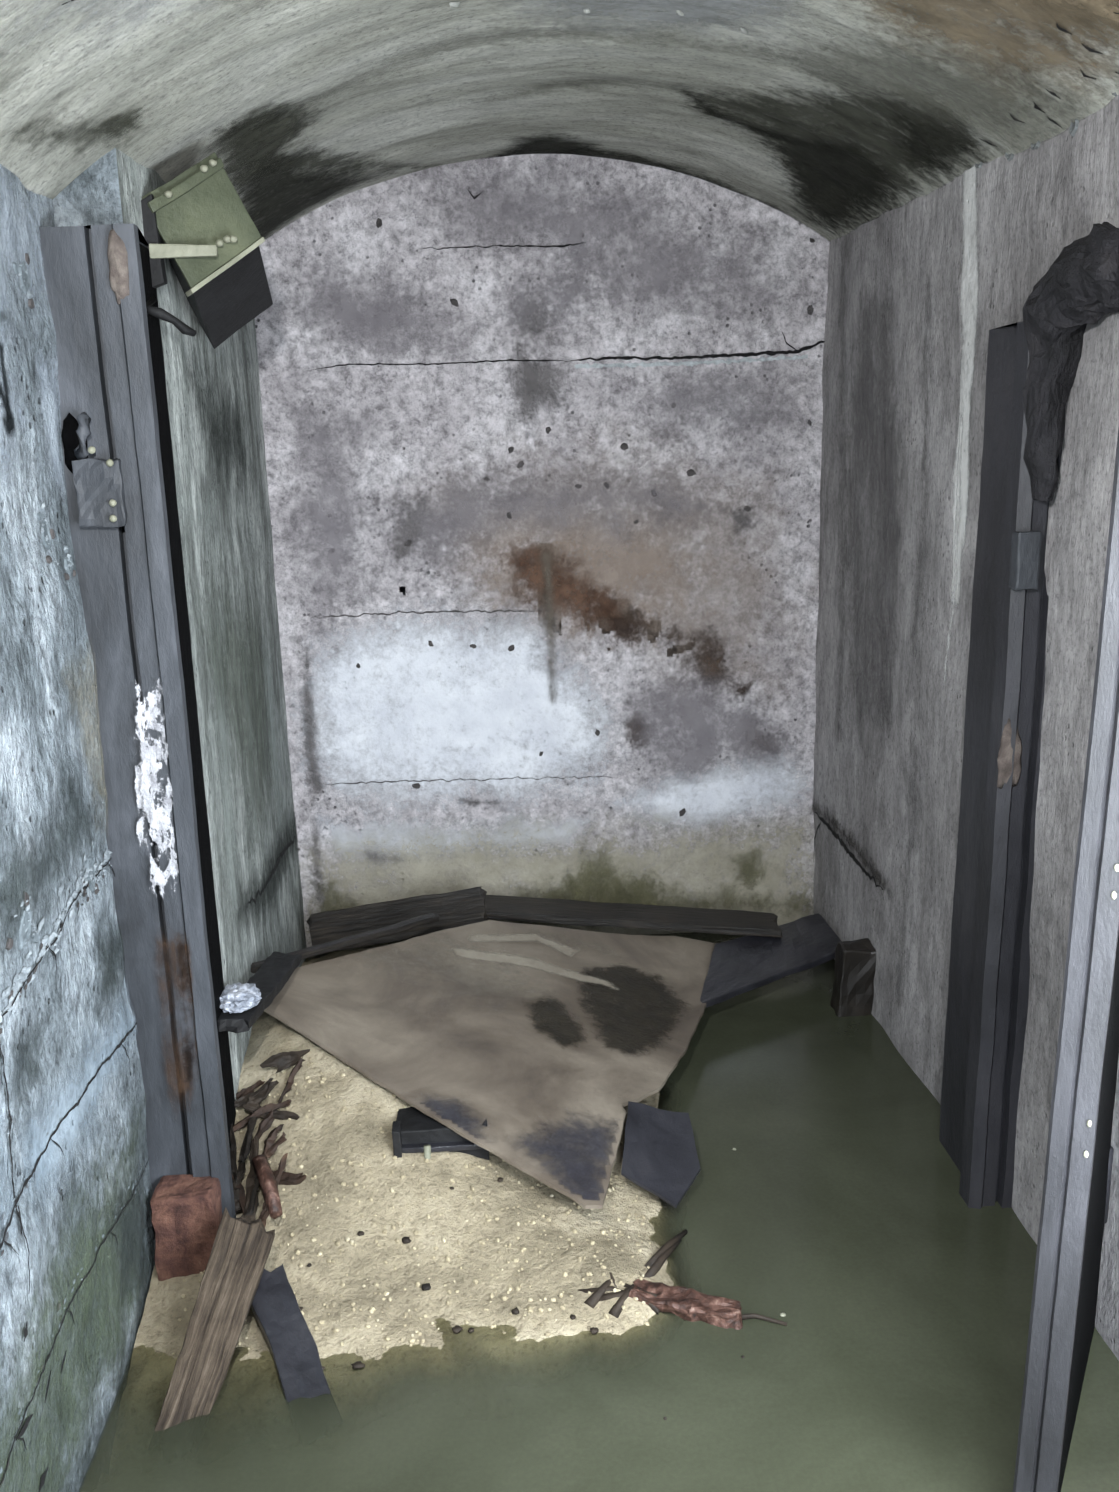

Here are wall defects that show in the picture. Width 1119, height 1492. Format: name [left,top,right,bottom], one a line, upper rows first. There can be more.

leakage [211,103,404,238]
leakage [301,274,437,353]
leakage [468,175,769,335]
leakage [670,0,1119,680]
leakage [301,416,359,593]
leakage [395,491,570,559]
rust [509,533,671,663]
leakage [304,617,811,935]
leakage [333,940,406,952]